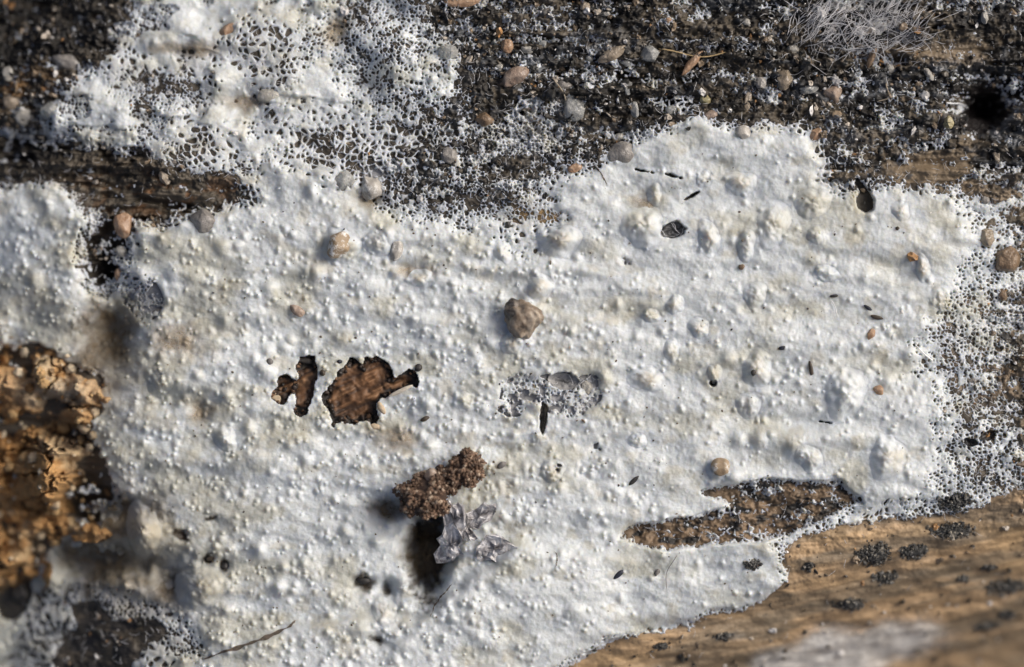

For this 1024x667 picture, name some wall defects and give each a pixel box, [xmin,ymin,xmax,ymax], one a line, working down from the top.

leakage [78,305,133,374]
leakage [159,328,190,349]
peeling [271,355,419,429]
leakage [373,501,404,518]
leakage [62,539,128,597]
leakage [406,521,440,572]